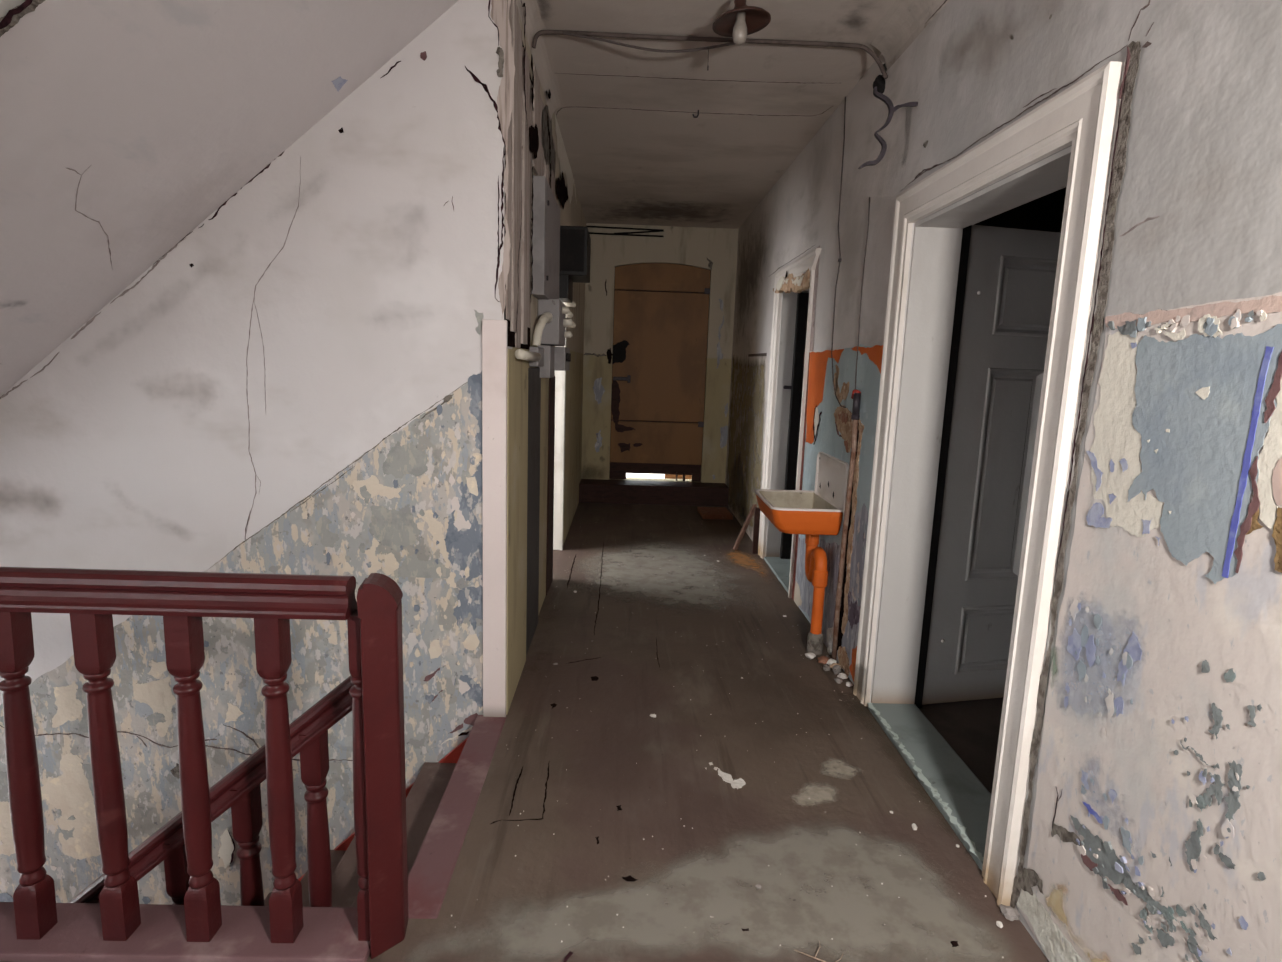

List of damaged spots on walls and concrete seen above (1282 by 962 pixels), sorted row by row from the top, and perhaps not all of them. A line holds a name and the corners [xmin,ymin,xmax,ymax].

crack [465,66,505,302]
crack [488,0,499,46]
crack [870,0,1154,201]
crack [0,145,467,569]
peeling [196,372,483,789]
peeling [773,245,883,683]
peeling [1010,41,1282,962]
peeling [0,768,21,902]
peeling [29,655,104,903]
peeling [107,615,182,854]
peeling [211,807,241,906]
peeling [325,711,355,850]